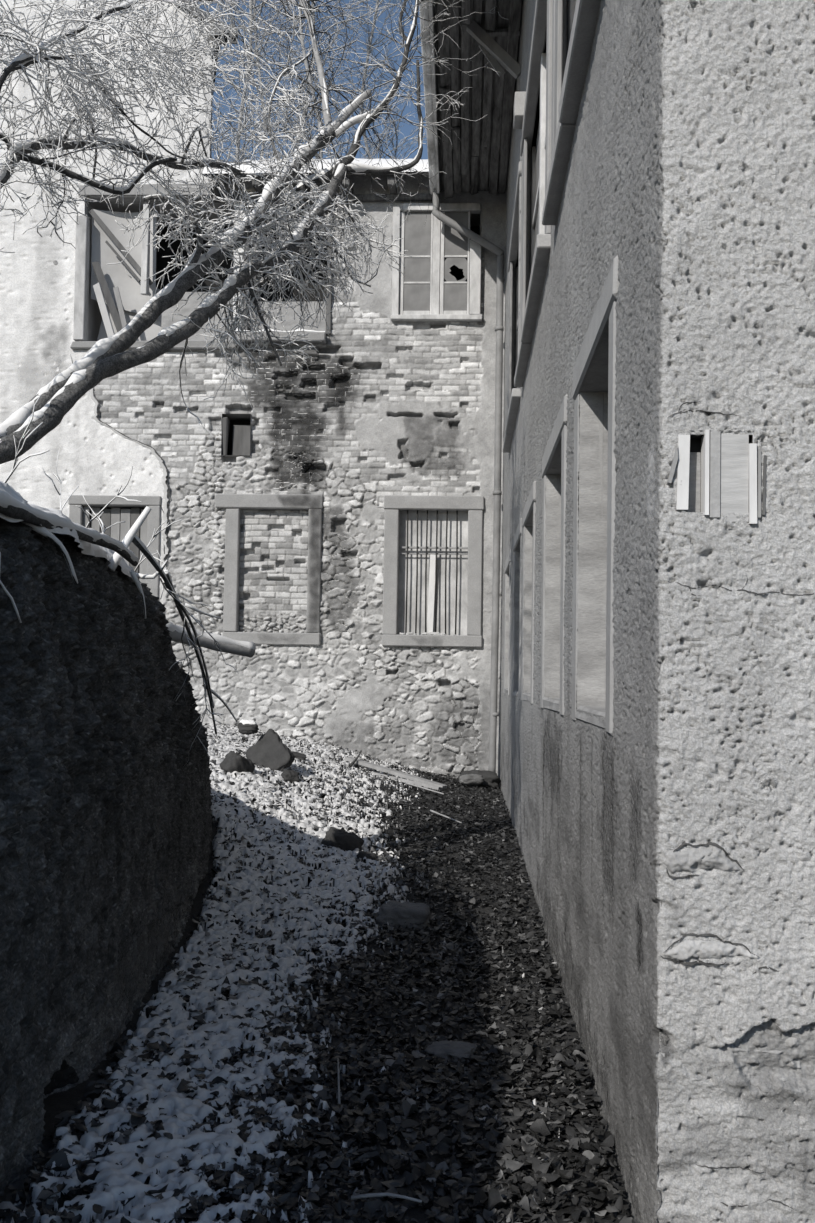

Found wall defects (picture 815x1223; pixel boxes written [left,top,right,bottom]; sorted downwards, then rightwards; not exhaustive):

leakage [243,346,359,620]
spalling [722,1019,815,1094]